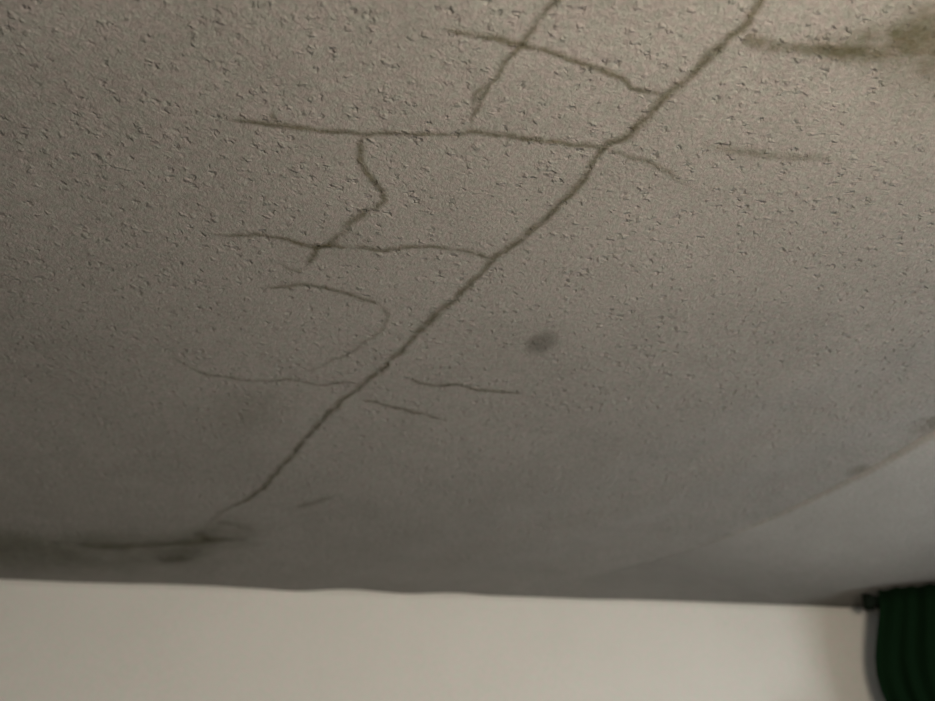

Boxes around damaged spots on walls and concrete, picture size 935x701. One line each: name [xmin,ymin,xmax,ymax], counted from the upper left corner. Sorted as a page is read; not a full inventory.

crack [694,0,763,74]
crack [487,125,638,266]